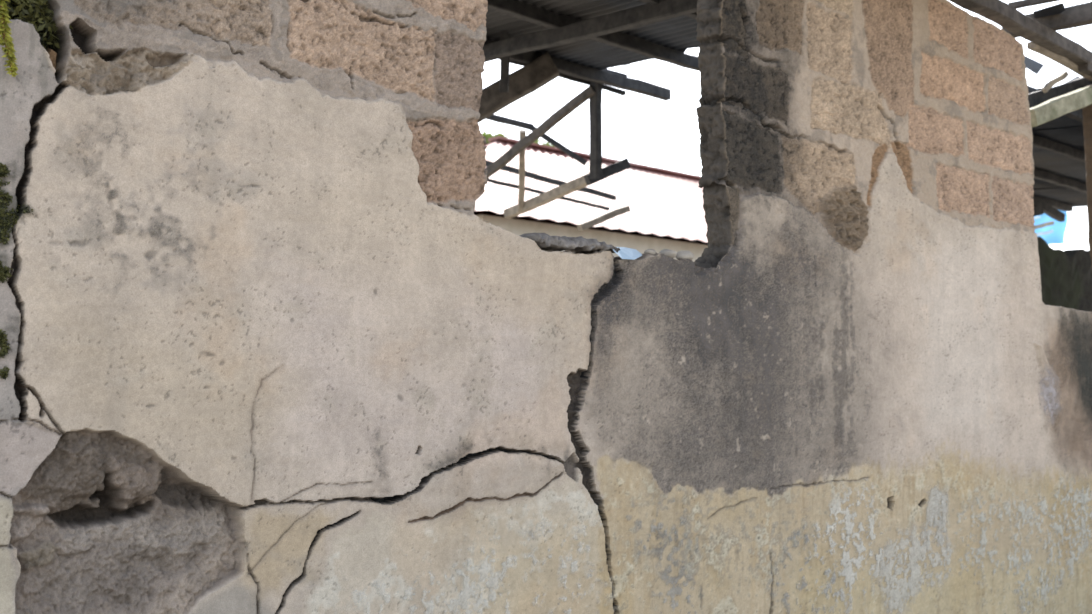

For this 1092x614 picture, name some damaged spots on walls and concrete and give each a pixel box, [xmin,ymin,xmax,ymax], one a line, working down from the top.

crack [0,79,70,437]
spalling [5,0,198,97]
spalling [537,245,623,264]
spalling [678,0,734,269]
spalling [1082,104,1092,262]
spalling [9,427,273,614]
crack [238,254,623,614]